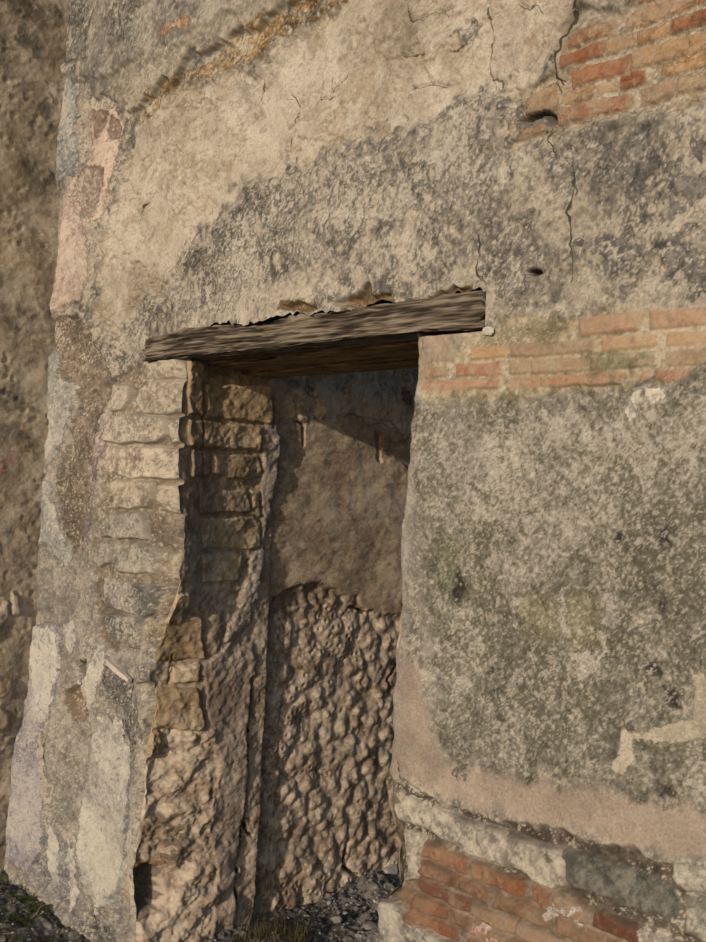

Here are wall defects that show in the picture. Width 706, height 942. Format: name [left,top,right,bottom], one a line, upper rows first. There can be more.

crack [554,0,579,93]
crack [541,127,578,283]
flaking render [38,0,706,573]
flaking render [197,412,412,939]
water stain [542,898,583,927]
water stain [636,924,674,942]